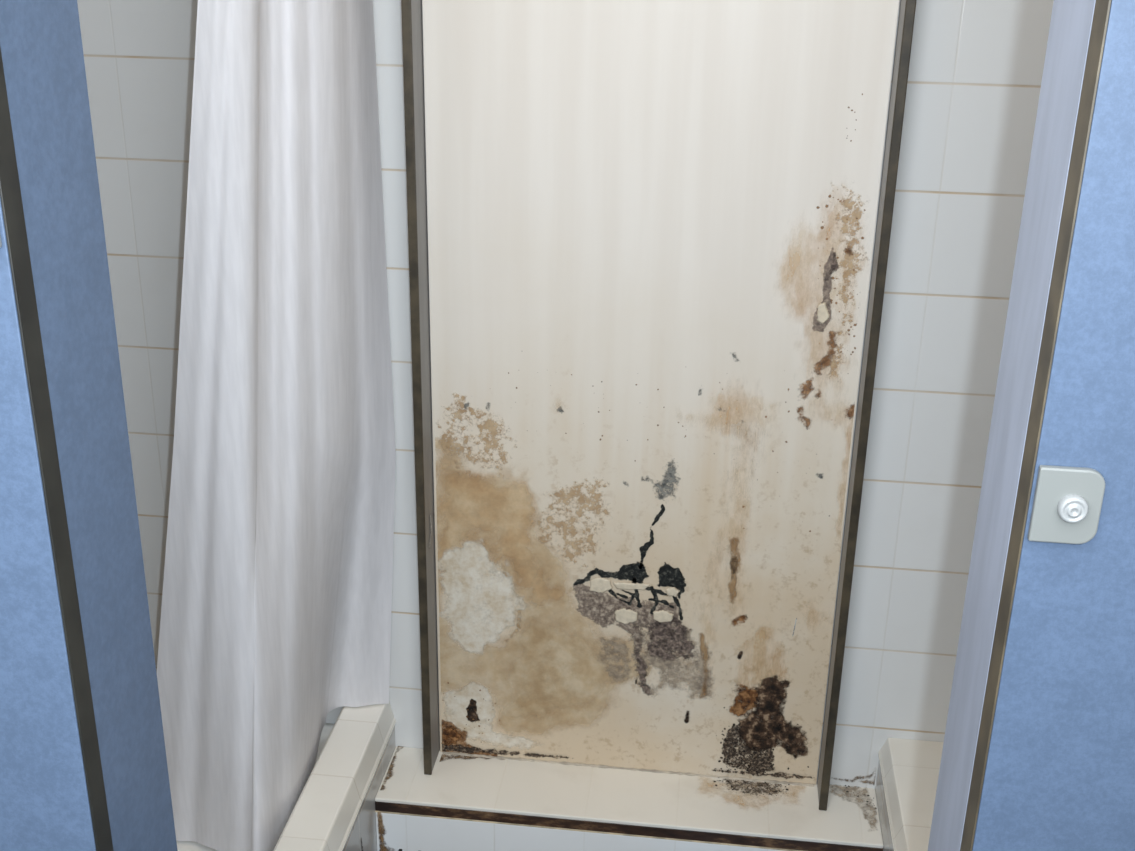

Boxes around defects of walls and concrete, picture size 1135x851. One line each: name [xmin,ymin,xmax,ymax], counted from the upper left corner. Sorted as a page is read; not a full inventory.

leakage [829,191,862,375]
leakage [436,394,712,733]
spalling [573,562,686,627]
crack [639,462,678,569]